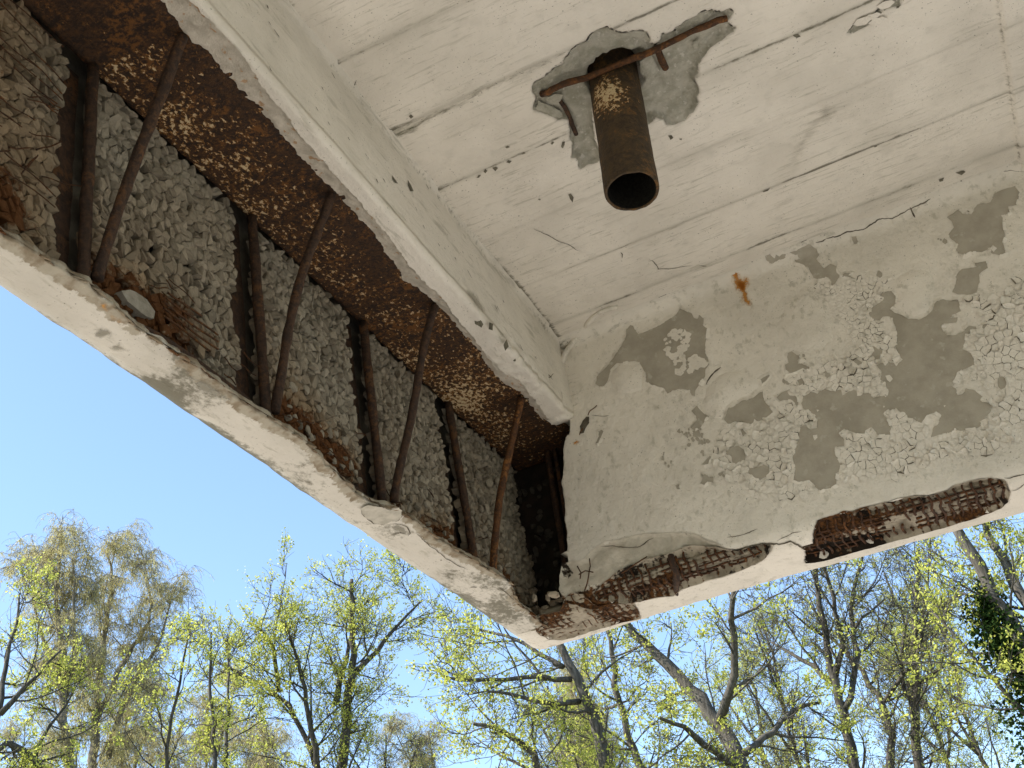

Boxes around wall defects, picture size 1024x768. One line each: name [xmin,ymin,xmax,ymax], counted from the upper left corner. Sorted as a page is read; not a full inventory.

crack [802,199,930,243]
spalling [0,0,773,640]
rust [733,272,750,304]
peeling [590,182,1024,502]
spalling [802,478,1010,563]